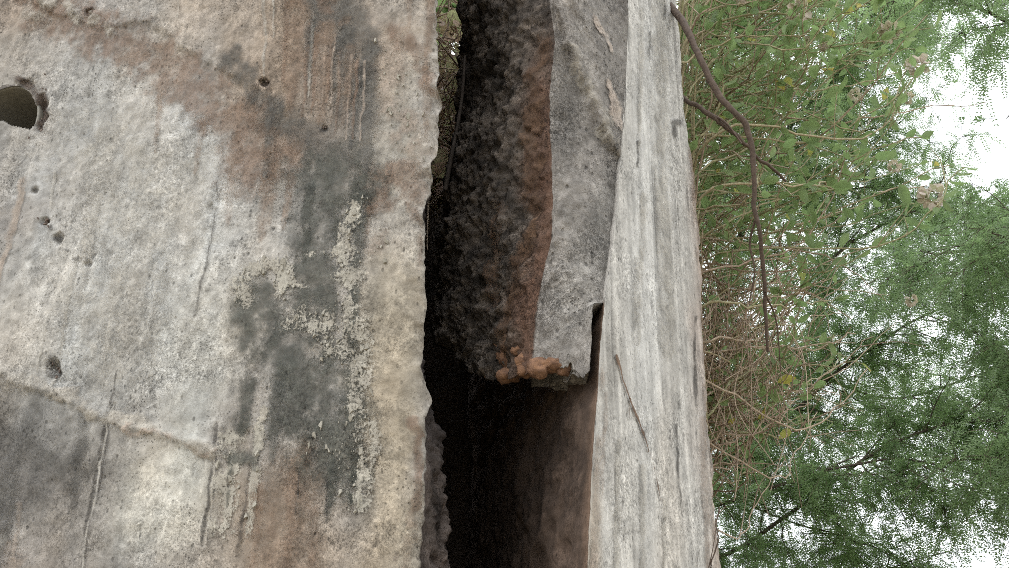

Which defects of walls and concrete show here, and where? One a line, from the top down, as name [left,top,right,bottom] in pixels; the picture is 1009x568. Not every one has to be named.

spalling [15,76,49,131]
damp [219,0,383,514]
crack [82,369,118,568]